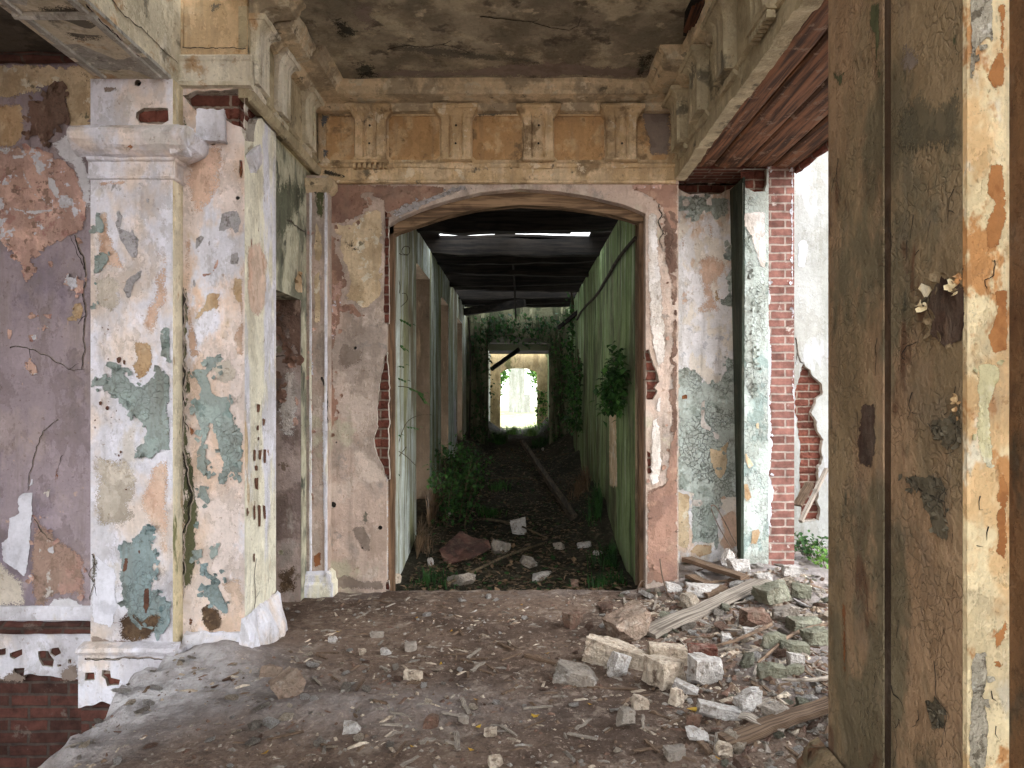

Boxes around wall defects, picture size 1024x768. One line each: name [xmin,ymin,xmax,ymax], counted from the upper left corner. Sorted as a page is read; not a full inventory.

peeling [0,64,123,321]
crack [10,232,87,371]
peeling [0,253,172,641]
peeling [187,184,472,508]
peeling [632,169,773,584]
spalling [794,364,823,522]
peeling [915,271,964,349]
spalling [0,648,27,677]
spalling [38,647,71,667]
spalling [85,670,120,686]